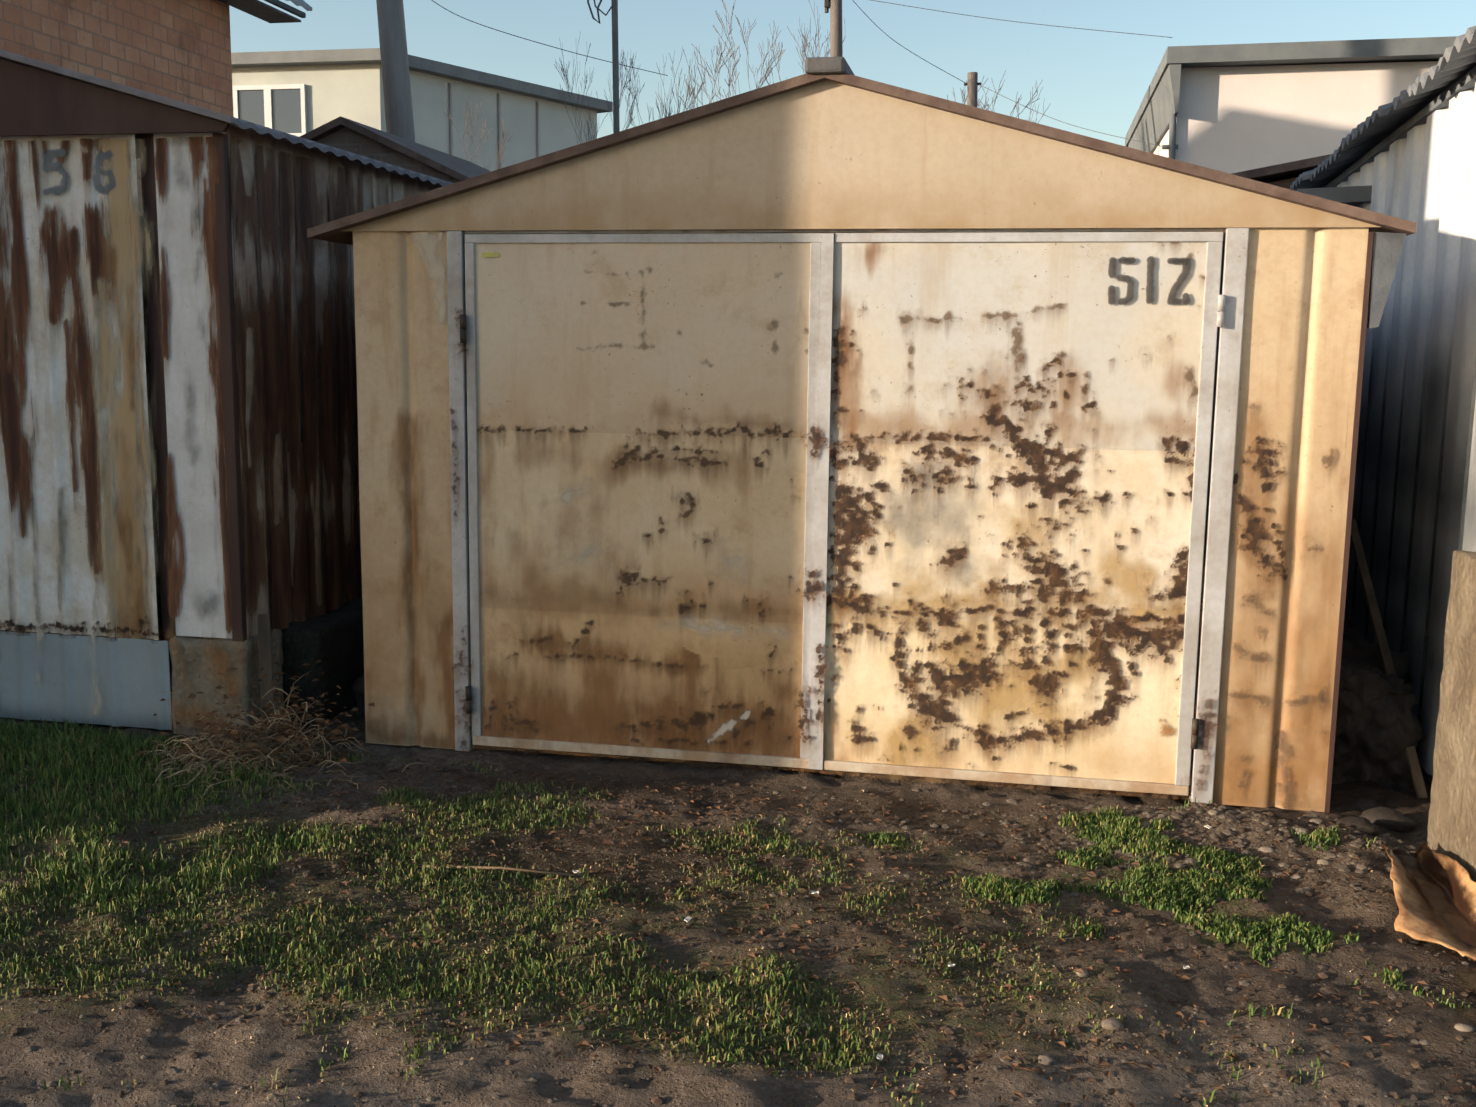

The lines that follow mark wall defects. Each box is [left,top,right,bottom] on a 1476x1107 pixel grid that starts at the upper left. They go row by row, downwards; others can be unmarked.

corrosion [0,138,185,640]
corrosion [188,137,393,634]
corrosion [369,303,1206,786]
corrosion [1233,436,1288,663]
corrosion [1322,448,1335,469]
corrosion [1230,689,1327,710]
corrosion [1275,731,1294,808]